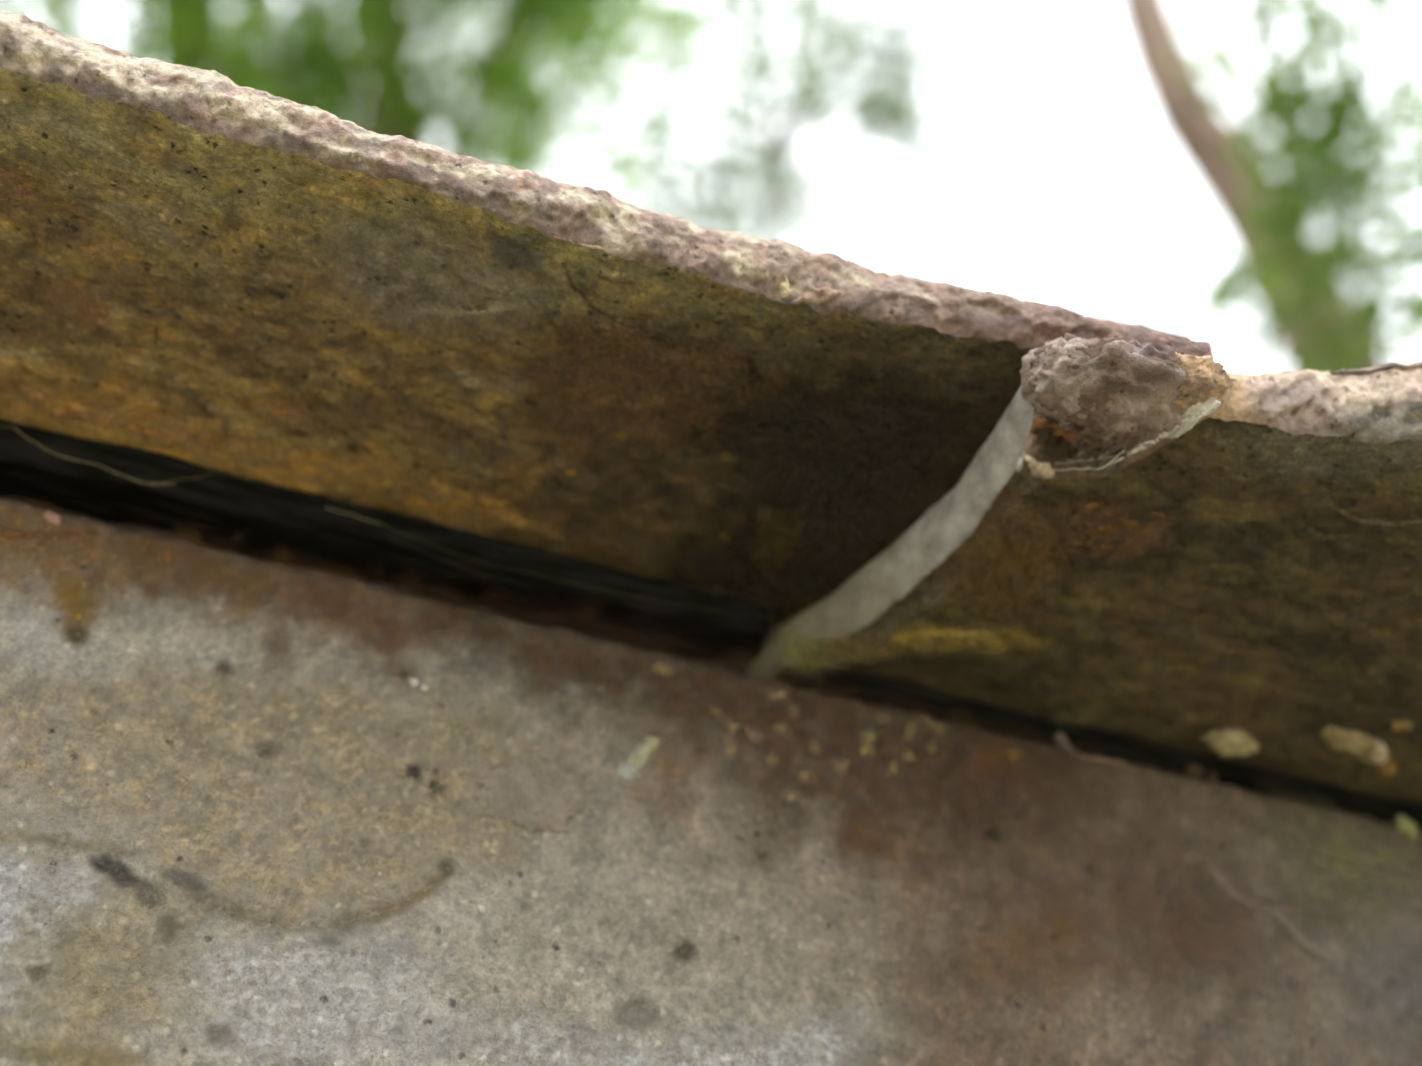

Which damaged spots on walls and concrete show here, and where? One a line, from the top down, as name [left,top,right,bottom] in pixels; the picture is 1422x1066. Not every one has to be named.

spalling [0,11,1422,479]
damp [662,372,979,621]
damp [514,641,1078,853]